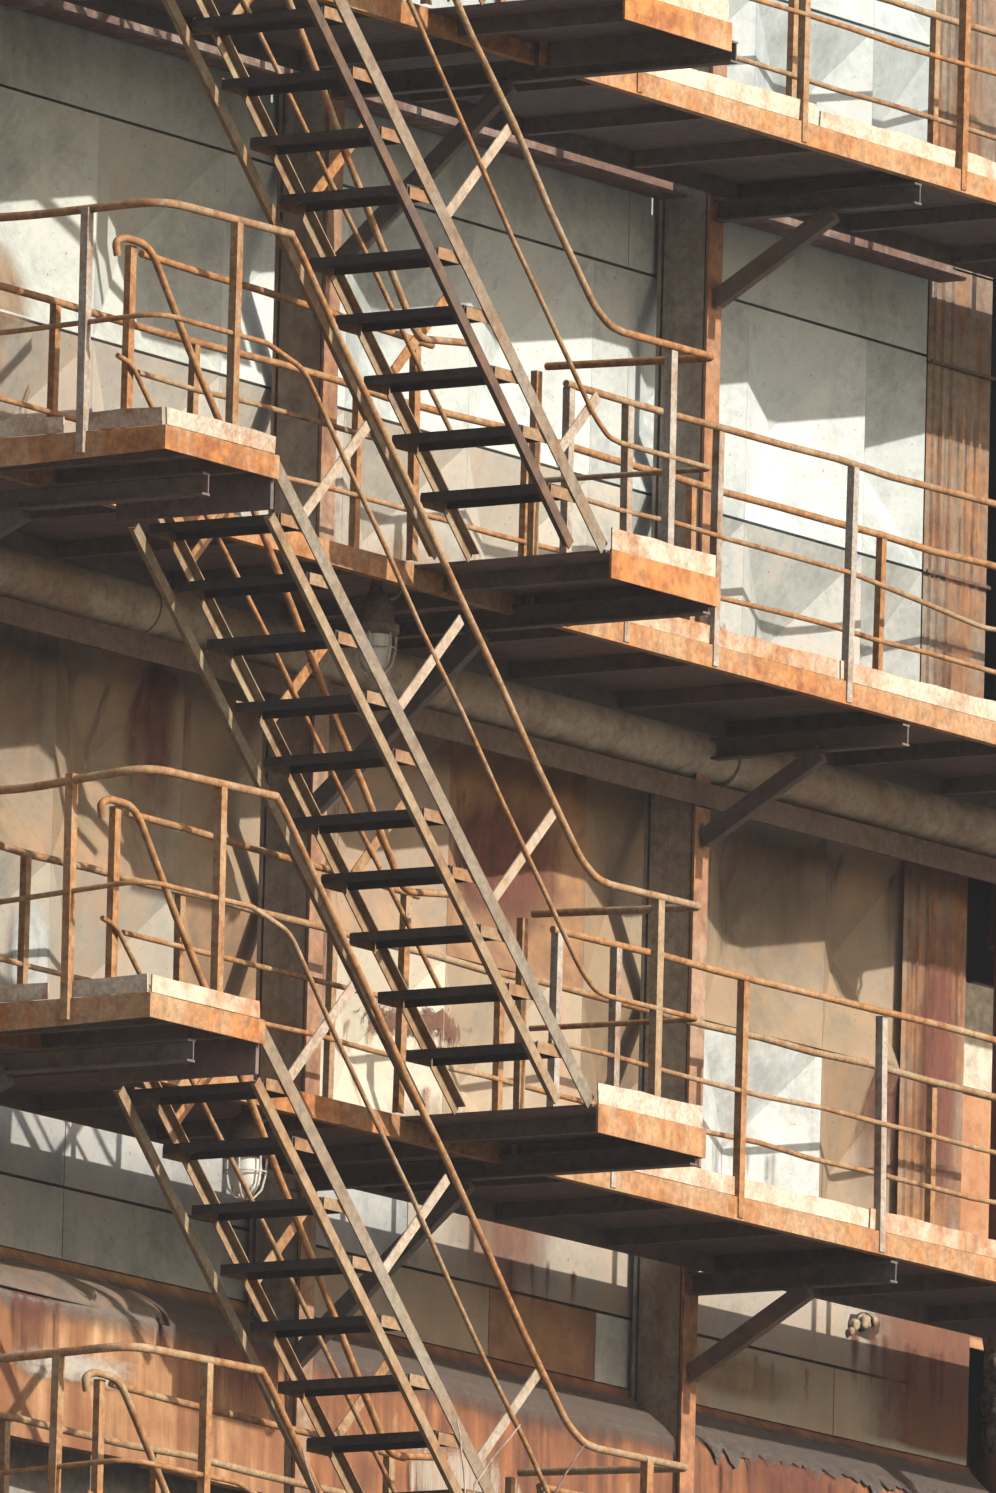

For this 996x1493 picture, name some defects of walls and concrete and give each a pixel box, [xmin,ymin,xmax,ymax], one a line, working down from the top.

rust [935,400,981,557]
rust [462,793,554,917]
rust [916,907,964,1179]
rust [219,1340,259,1395]